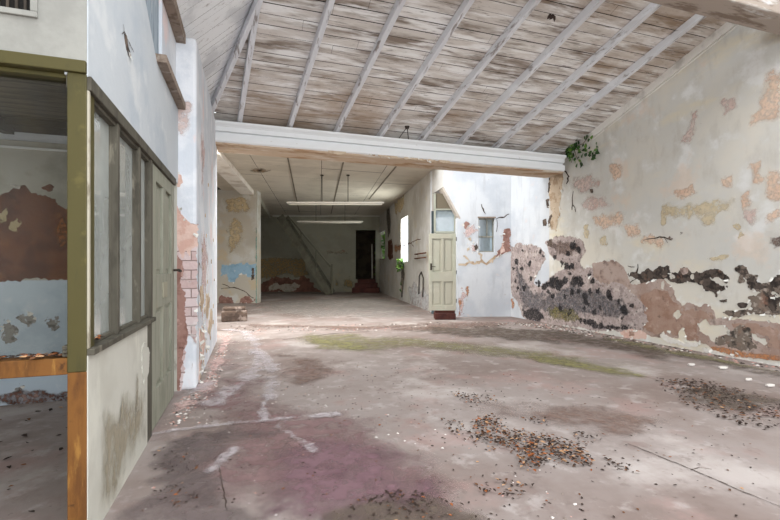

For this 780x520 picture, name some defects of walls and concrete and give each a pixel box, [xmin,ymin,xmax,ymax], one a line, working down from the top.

flaking render [0,184,67,282]
peeling [463,221,480,253]
flaking render [496,228,511,258]
peeling [574,176,663,247]
peeling [0,311,60,344]
flaking render [177,207,321,391]
flaking render [588,258,780,365]
leakage [105,389,142,493]